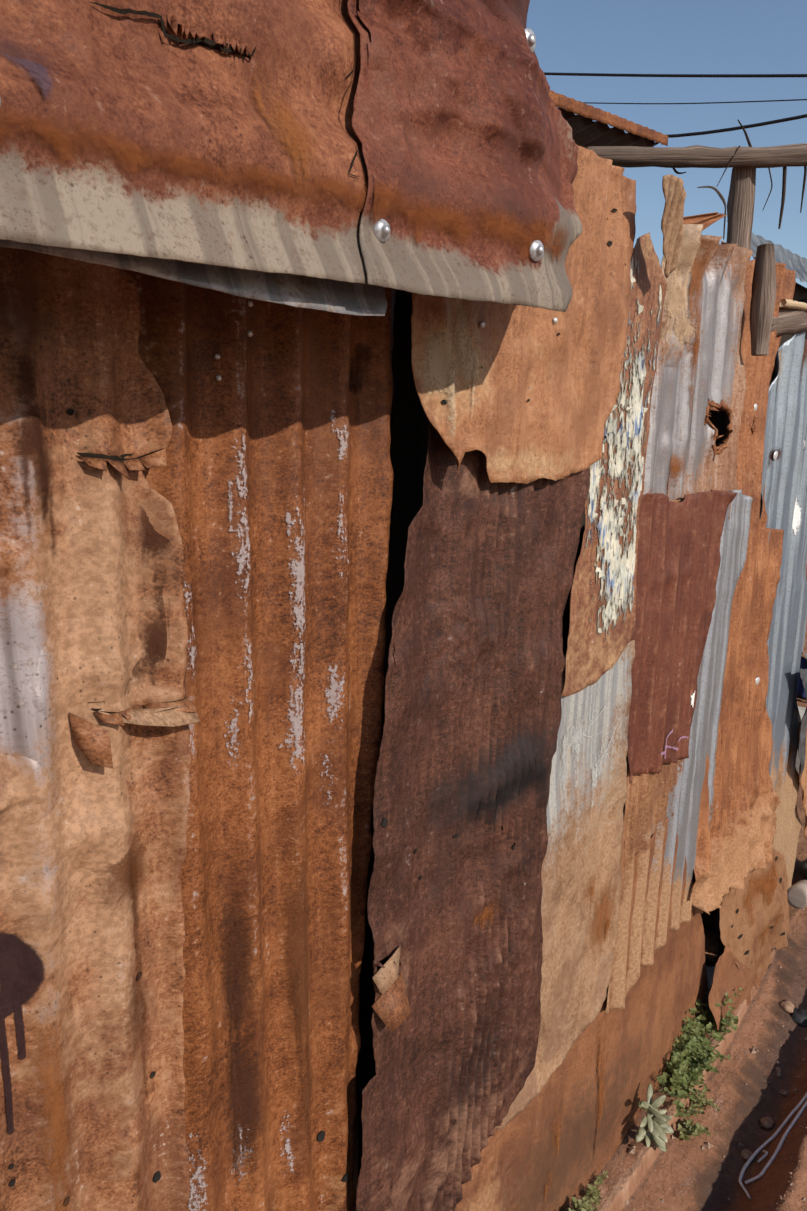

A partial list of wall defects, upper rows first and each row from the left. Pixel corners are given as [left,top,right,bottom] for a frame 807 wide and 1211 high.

crack [90,2,256,57]
rust [374,183,564,258]
rust [12,351,55,548]
peeling [583,233,701,640]
rust [141,510,170,551]
rust [132,575,169,685]
peeling [93,698,196,759]
rust [109,839,145,967]
rust [222,890,262,1171]